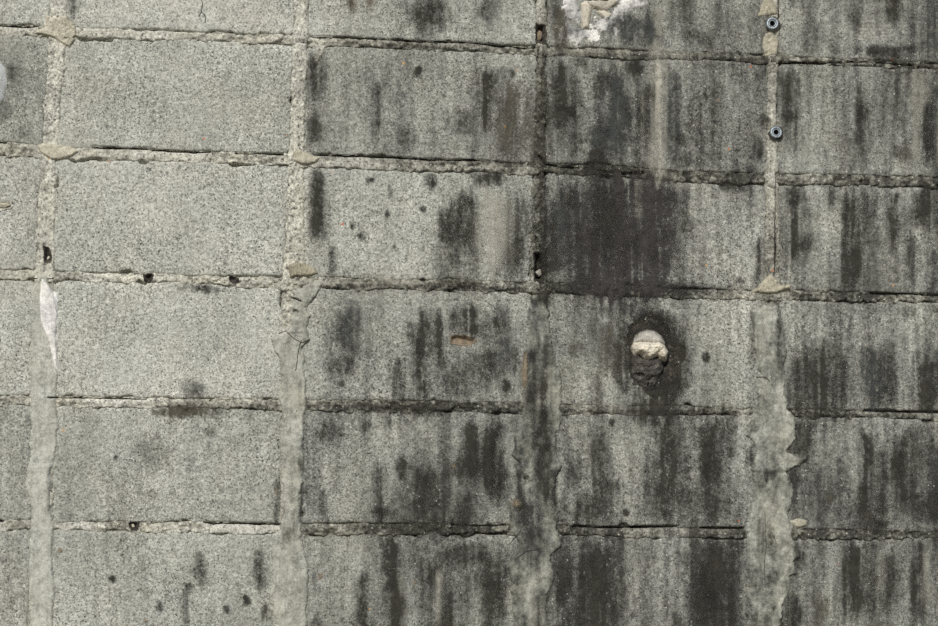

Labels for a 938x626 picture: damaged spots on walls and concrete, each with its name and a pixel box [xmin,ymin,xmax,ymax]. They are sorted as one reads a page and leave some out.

spalling [535,23,547,44]
peeling [558,0,648,50]
water stain [310,170,324,236]
water stain [472,170,528,274]
water stain [542,4,692,528]
water stain [786,183,813,260]
water stain [828,187,876,298]
water stain [407,303,519,416]
spalling [627,314,686,397]
water stain [448,335,556,569]
water stain [856,426,938,532]
water stain [380,537,406,626]